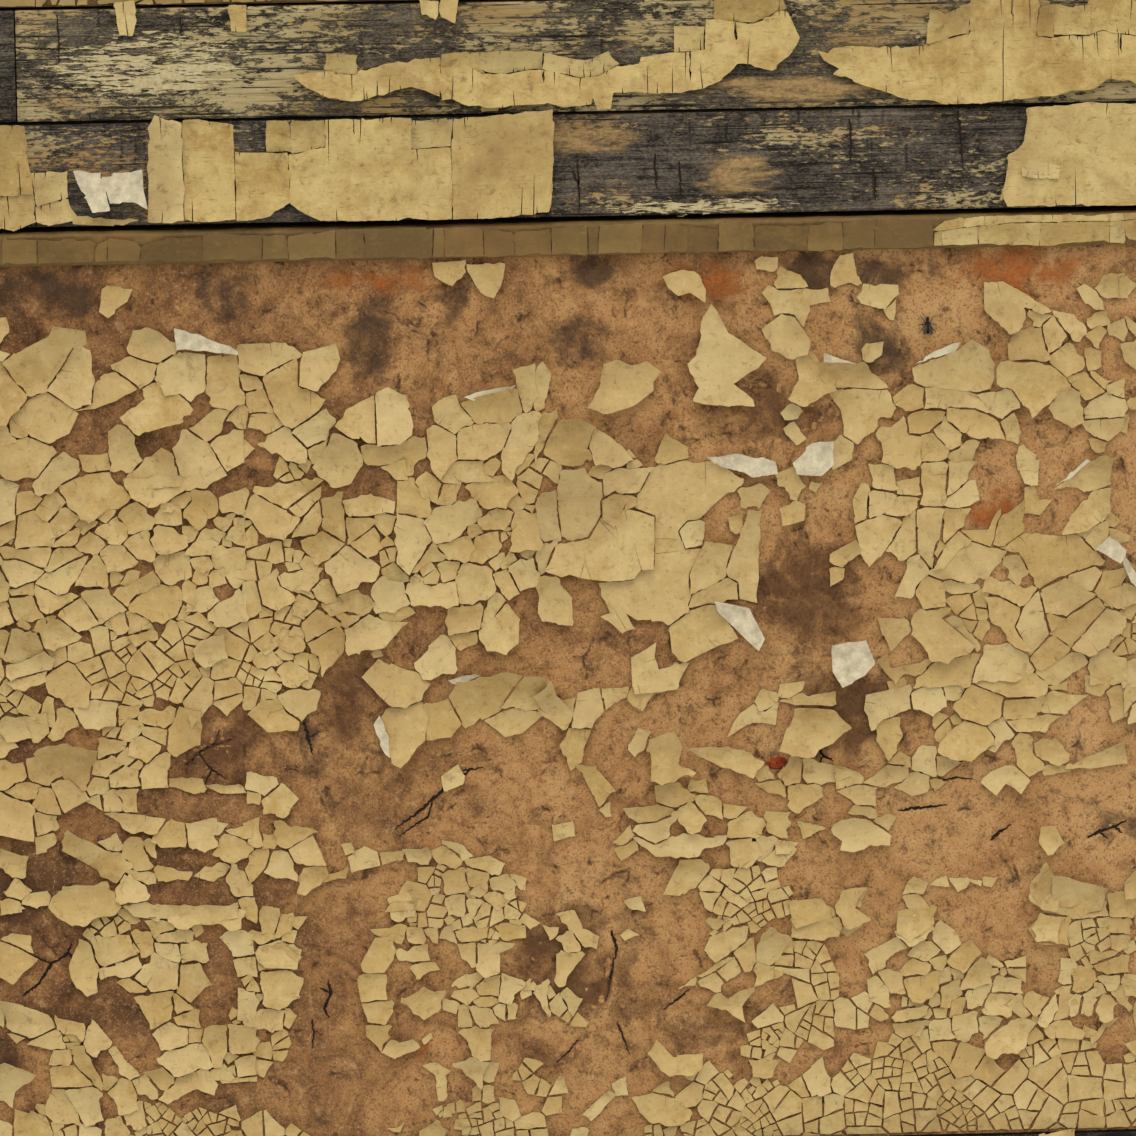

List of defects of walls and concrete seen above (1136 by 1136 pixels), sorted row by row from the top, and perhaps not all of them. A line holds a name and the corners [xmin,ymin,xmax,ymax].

peeling [818,0,1136,105]
peeling [0,0,800,231]
peeling [1000,102,1136,207]
peeling [0,213,1136,298]
peeling [0,253,1136,1136]
crack [990,824,1011,841]
crack [1087,820,1127,839]
crack [23,940,73,996]
crack [311,980,333,1048]
crack [605,930,630,1054]
crack [664,989,690,1010]